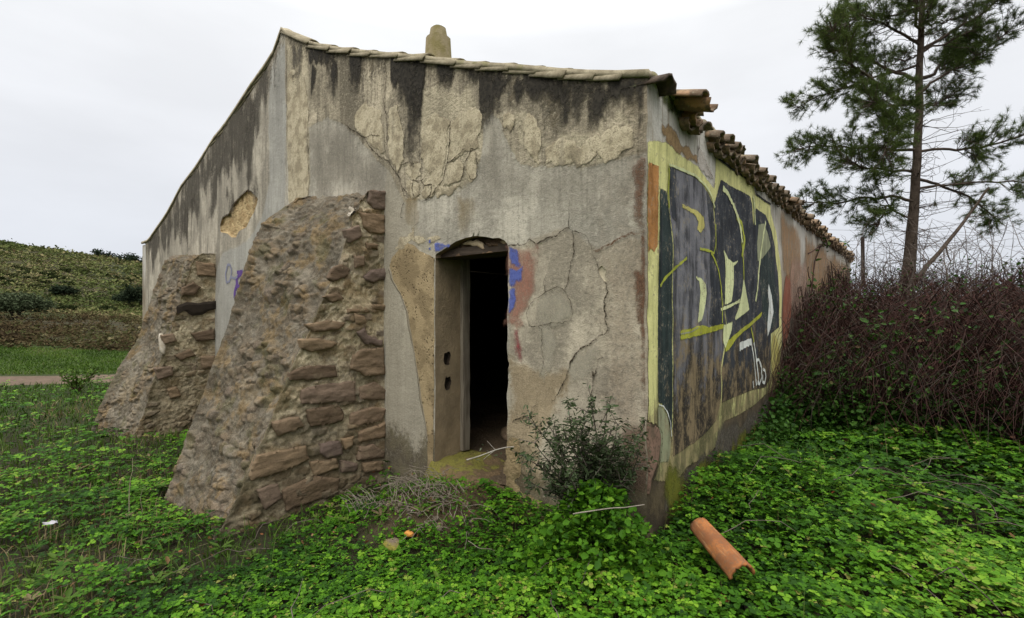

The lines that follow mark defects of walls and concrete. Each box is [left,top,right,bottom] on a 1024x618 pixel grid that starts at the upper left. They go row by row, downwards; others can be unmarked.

leakage [148,71,275,271]
spalling [220,189,258,237]
leakage [292,44,361,96]
peeling [354,101,482,199]
leakage [390,58,643,165]
peeling [502,112,634,168]
peeling [388,228,509,467]
crack [508,203,635,422]